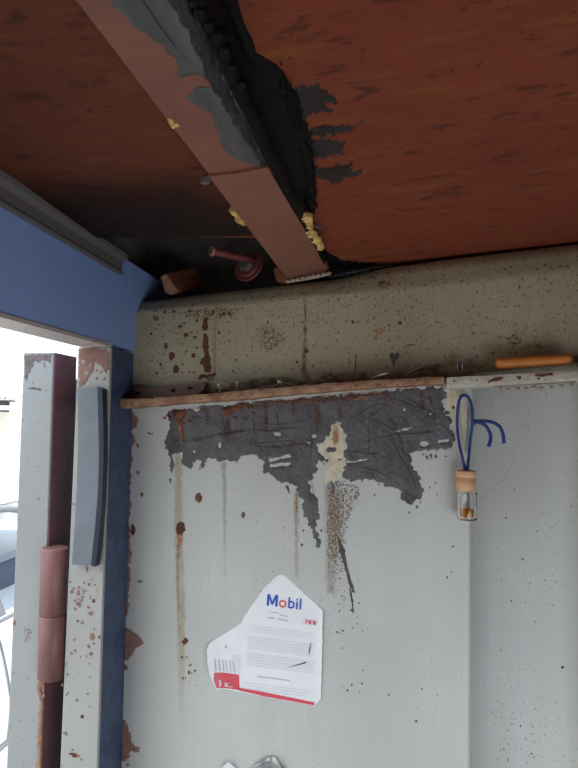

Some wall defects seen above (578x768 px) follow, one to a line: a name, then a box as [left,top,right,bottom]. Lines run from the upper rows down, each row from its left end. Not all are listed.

corrosion [146,306,244,379]
peeling [24,354,52,391]
peeling [78,347,110,388]
corrosion [167,408,200,438]
peeling [444,389,460,427]
peeling [319,422,346,483]
corrosion [176,521,185,547]
corrosion [69,581,96,624]